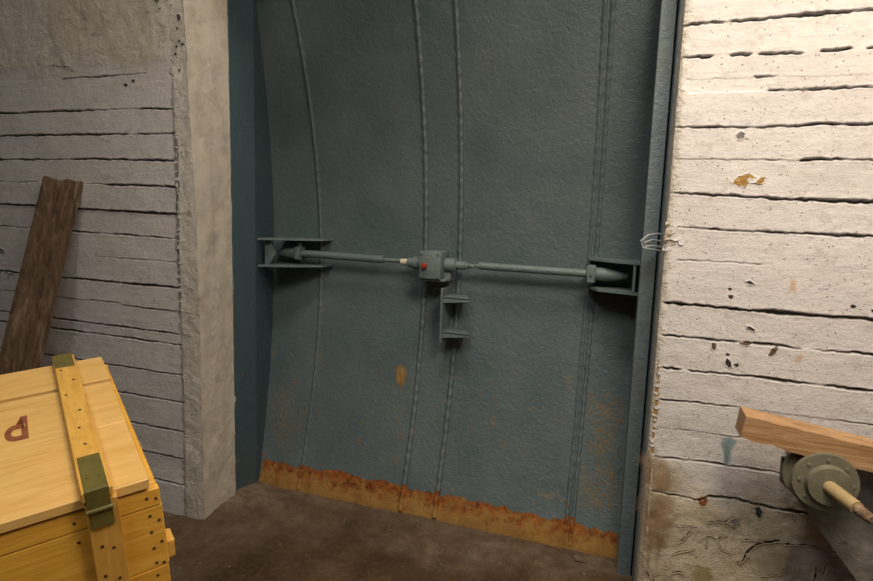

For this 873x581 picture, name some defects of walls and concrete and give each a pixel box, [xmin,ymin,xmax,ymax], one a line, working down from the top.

spalling [731,171,768,189]
rust [259,459,618,559]
spalling [696,494,710,508]
crack [642,518,829,581]